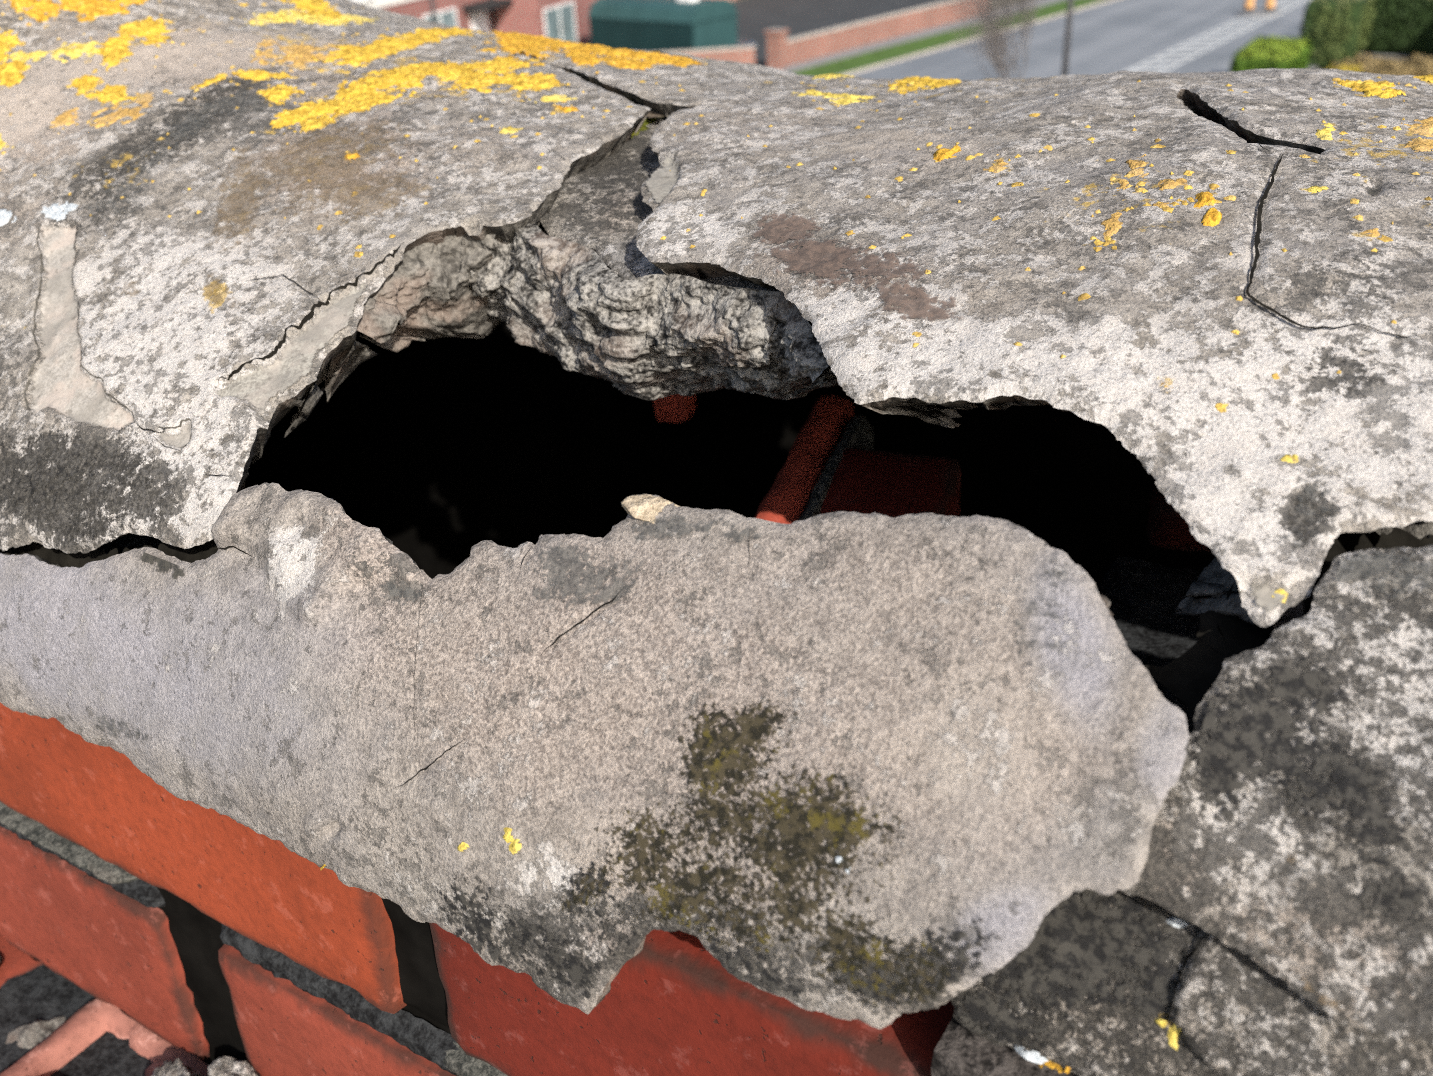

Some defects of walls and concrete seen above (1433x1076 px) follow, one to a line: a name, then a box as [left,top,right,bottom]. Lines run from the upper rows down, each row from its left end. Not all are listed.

crack [637,104,664,118]
crack [218,245,401,381]
spalling [216,118,840,416]
crack [1246,144,1420,338]
crack [0,540,254,568]
damp [428,696,1191,1052]